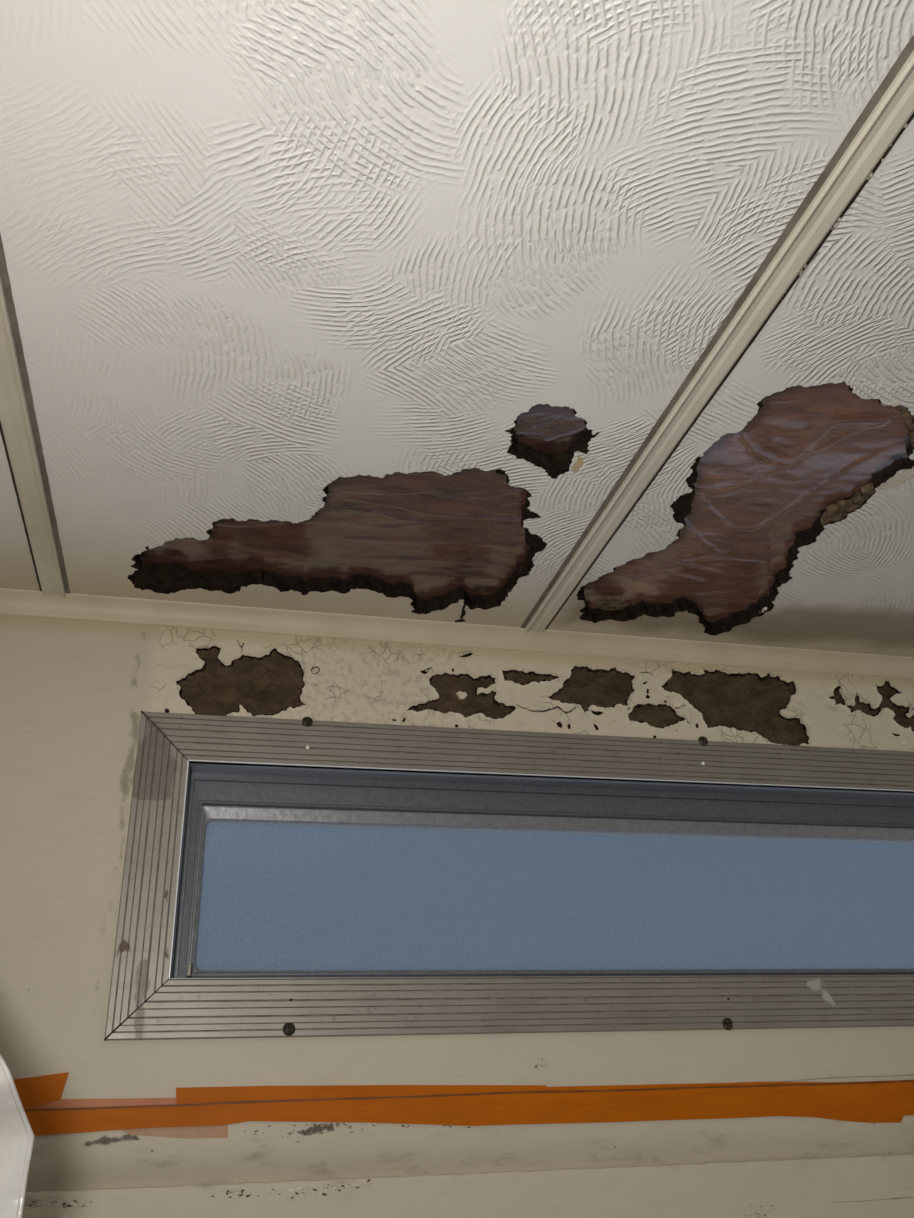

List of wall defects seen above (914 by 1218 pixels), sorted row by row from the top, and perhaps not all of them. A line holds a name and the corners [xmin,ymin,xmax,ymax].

peeling [510,427,591,477]
peeling [889,401,914,447]
peeling [672,457,700,522]
peeling [820,483,875,526]
peeling [522,505,546,574]
peeling [131,562,263,592]
peeling [165,643,309,718]
peeling [393,653,813,746]
peeling [825,678,914,745]